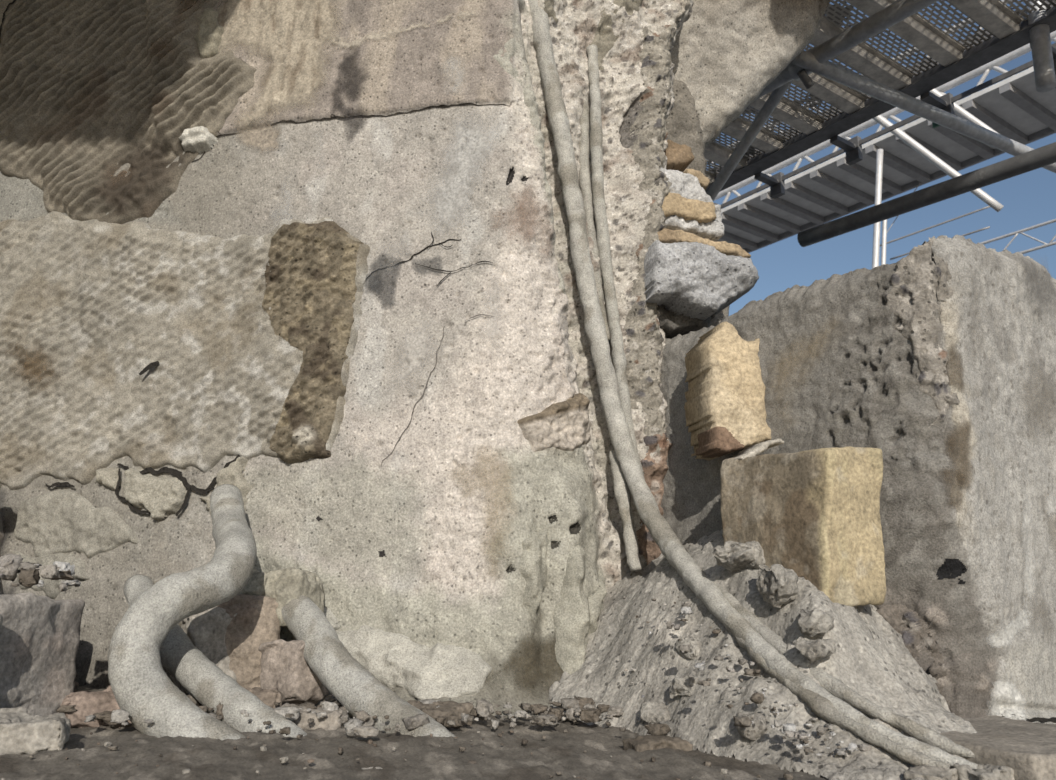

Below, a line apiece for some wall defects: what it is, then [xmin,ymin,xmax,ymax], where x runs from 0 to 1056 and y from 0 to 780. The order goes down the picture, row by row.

crack [0,0,16,36]
crack [270,103,508,126]
crack [192,131,240,162]
crack [366,232,493,286]
crack [381,314,495,466]